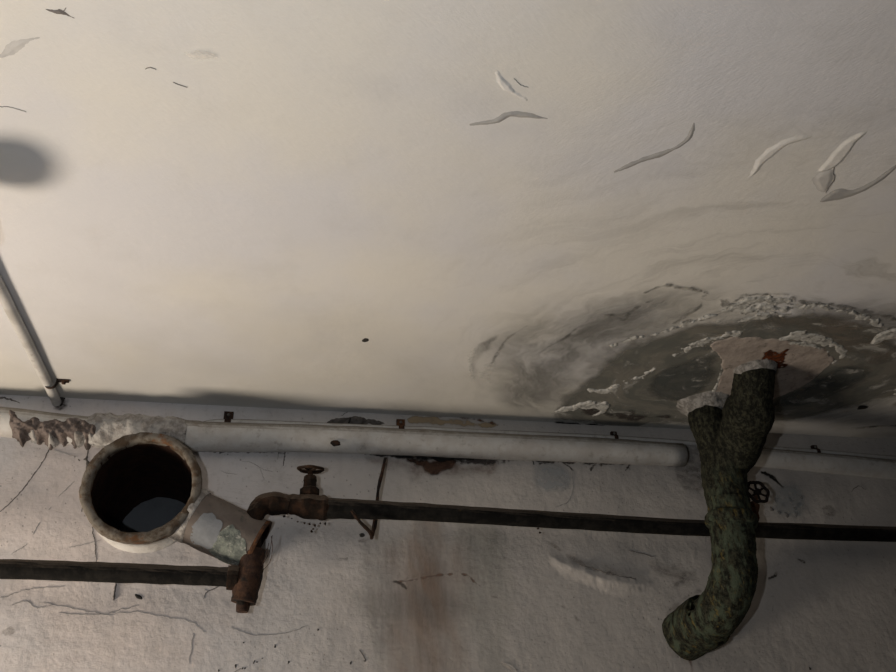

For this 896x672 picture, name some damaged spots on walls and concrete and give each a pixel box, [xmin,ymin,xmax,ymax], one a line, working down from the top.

peeling [747,135,813,179]
peeling [812,131,896,202]
leakage [558,314,896,426]